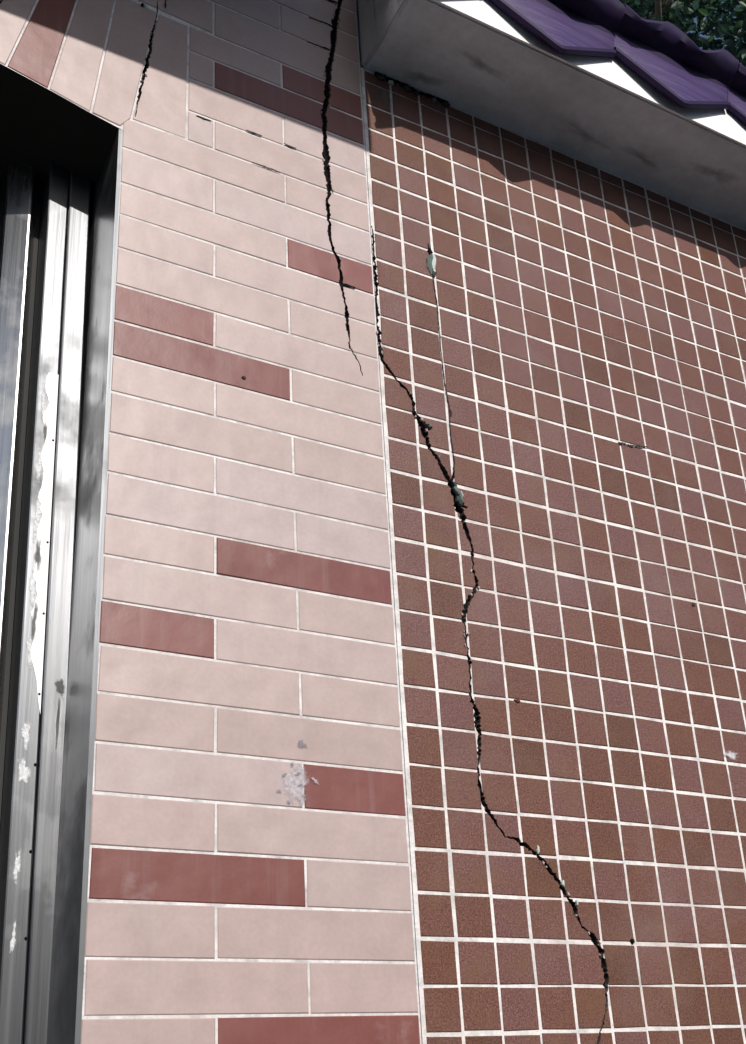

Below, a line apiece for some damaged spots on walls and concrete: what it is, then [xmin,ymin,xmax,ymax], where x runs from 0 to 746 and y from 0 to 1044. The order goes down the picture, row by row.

crack [136,0,167,104]
crack [307,0,383,360]
crack [409,244,480,664]
spalling [277,762,318,804]
crack [470,700,479,755]
crack [505,837,605,988]